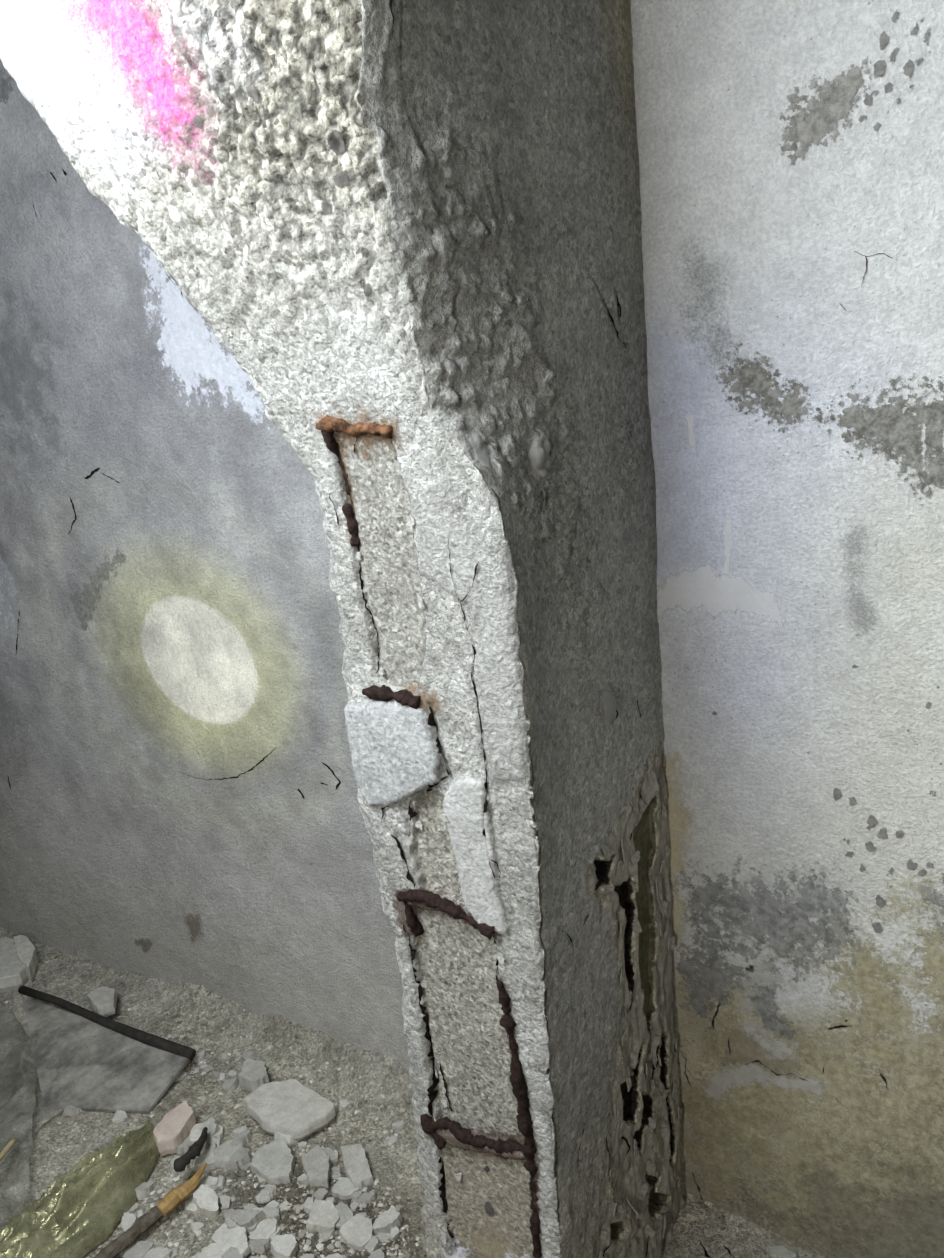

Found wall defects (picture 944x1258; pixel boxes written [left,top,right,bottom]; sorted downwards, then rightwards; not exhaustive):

crack [387,0,395,34]
mould [859,11,930,131]
mould [690,264,944,505]
rust [317,411,402,540]
spalling [335,432,427,690]
rust [392,885,473,937]
spalling [415,908,521,1139]
flaking render [587,741,687,1258]
damp [664,758,944,1258]
rust [425,1118,542,1223]
damp [443,1225,530,1258]
spalling [440,1142,534,1258]